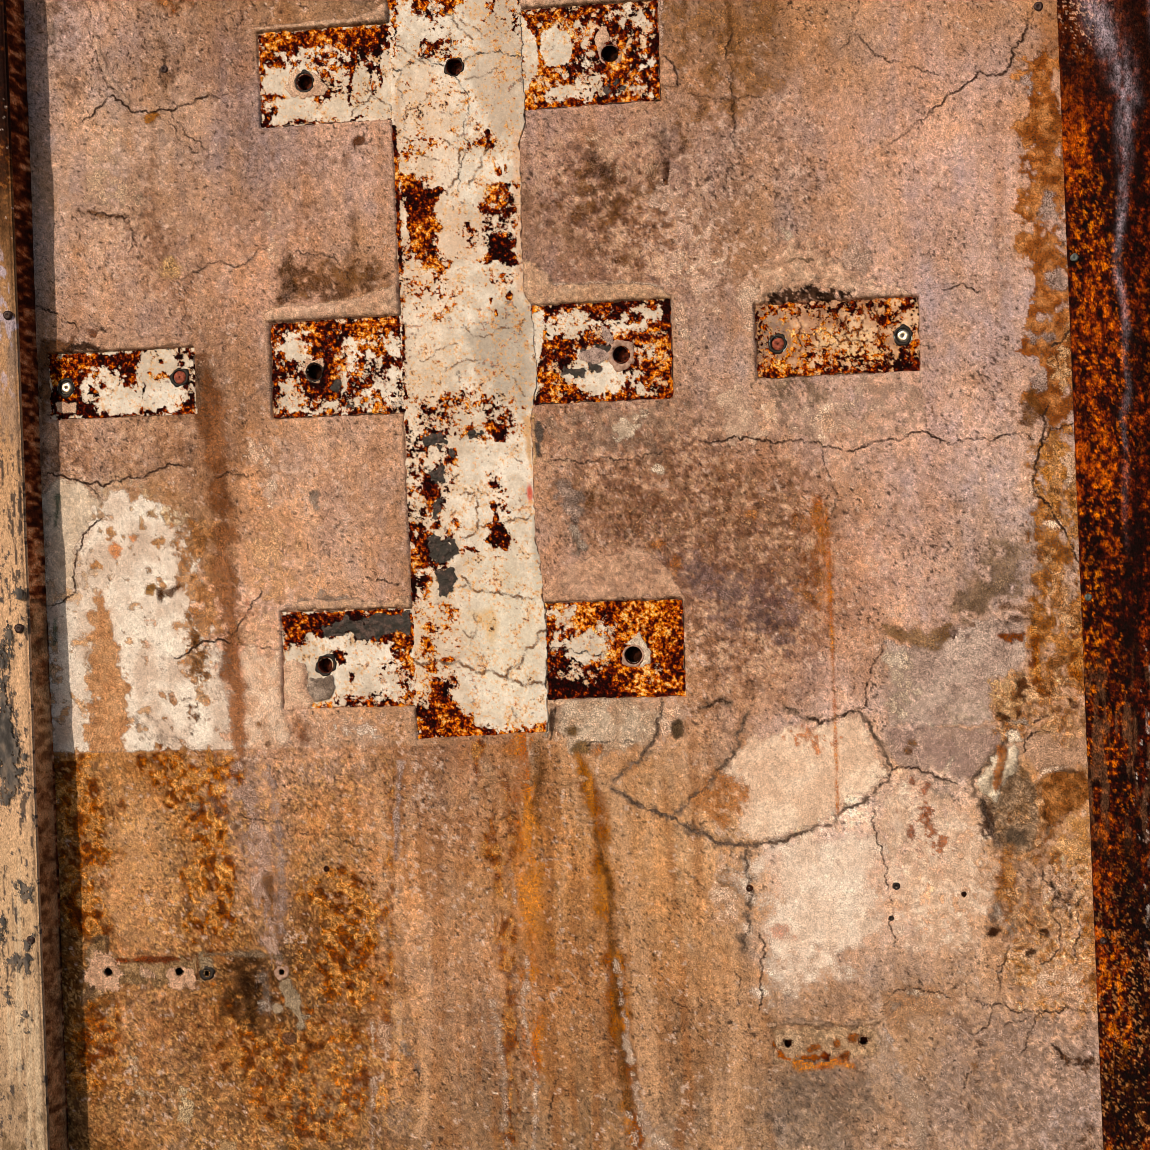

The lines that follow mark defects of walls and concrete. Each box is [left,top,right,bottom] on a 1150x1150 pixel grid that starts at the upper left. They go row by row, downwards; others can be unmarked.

crack [846,12,1033,141]
rust [48,347,197,420]
rust [755,297,921,378]
peeling [42,437,384,753]
rust [258,0,786,1150]
rust [54,751,127,943]
rust [128,743,252,954]
rust [208,771,398,1150]
rust [772,1033,862,1071]
crack [587,645,1053,1010]
crack [977,952,1090,1066]
crack [1028,870,1083,965]